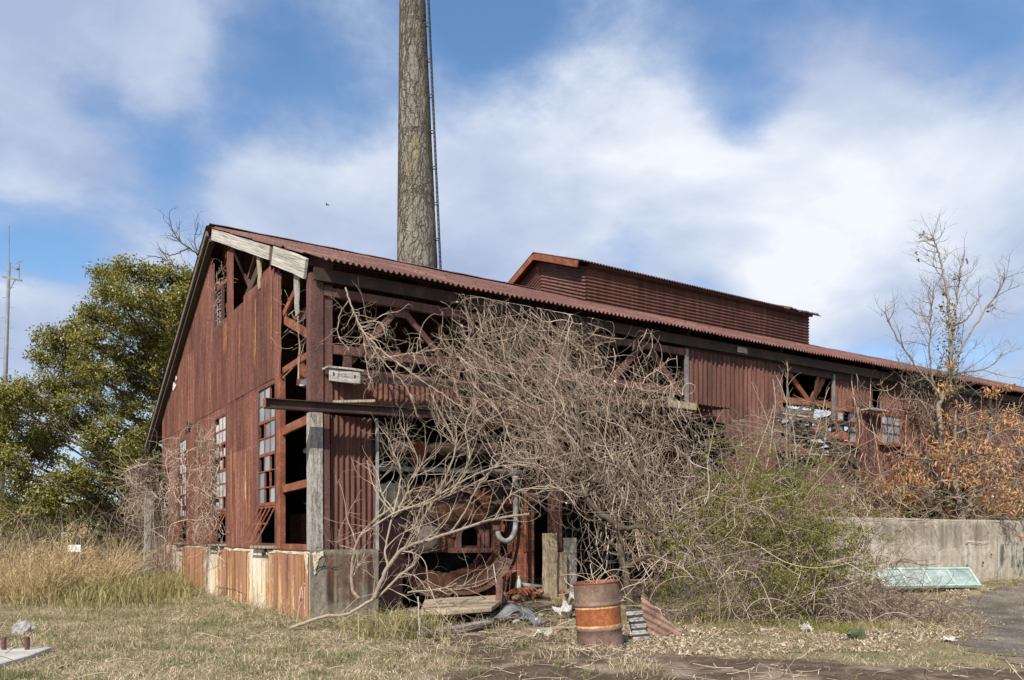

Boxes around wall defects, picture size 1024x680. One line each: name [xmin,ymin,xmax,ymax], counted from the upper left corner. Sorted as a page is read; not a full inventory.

rust [167,546,308,621]
damp [327,571,337,603]
damp [362,555,373,598]